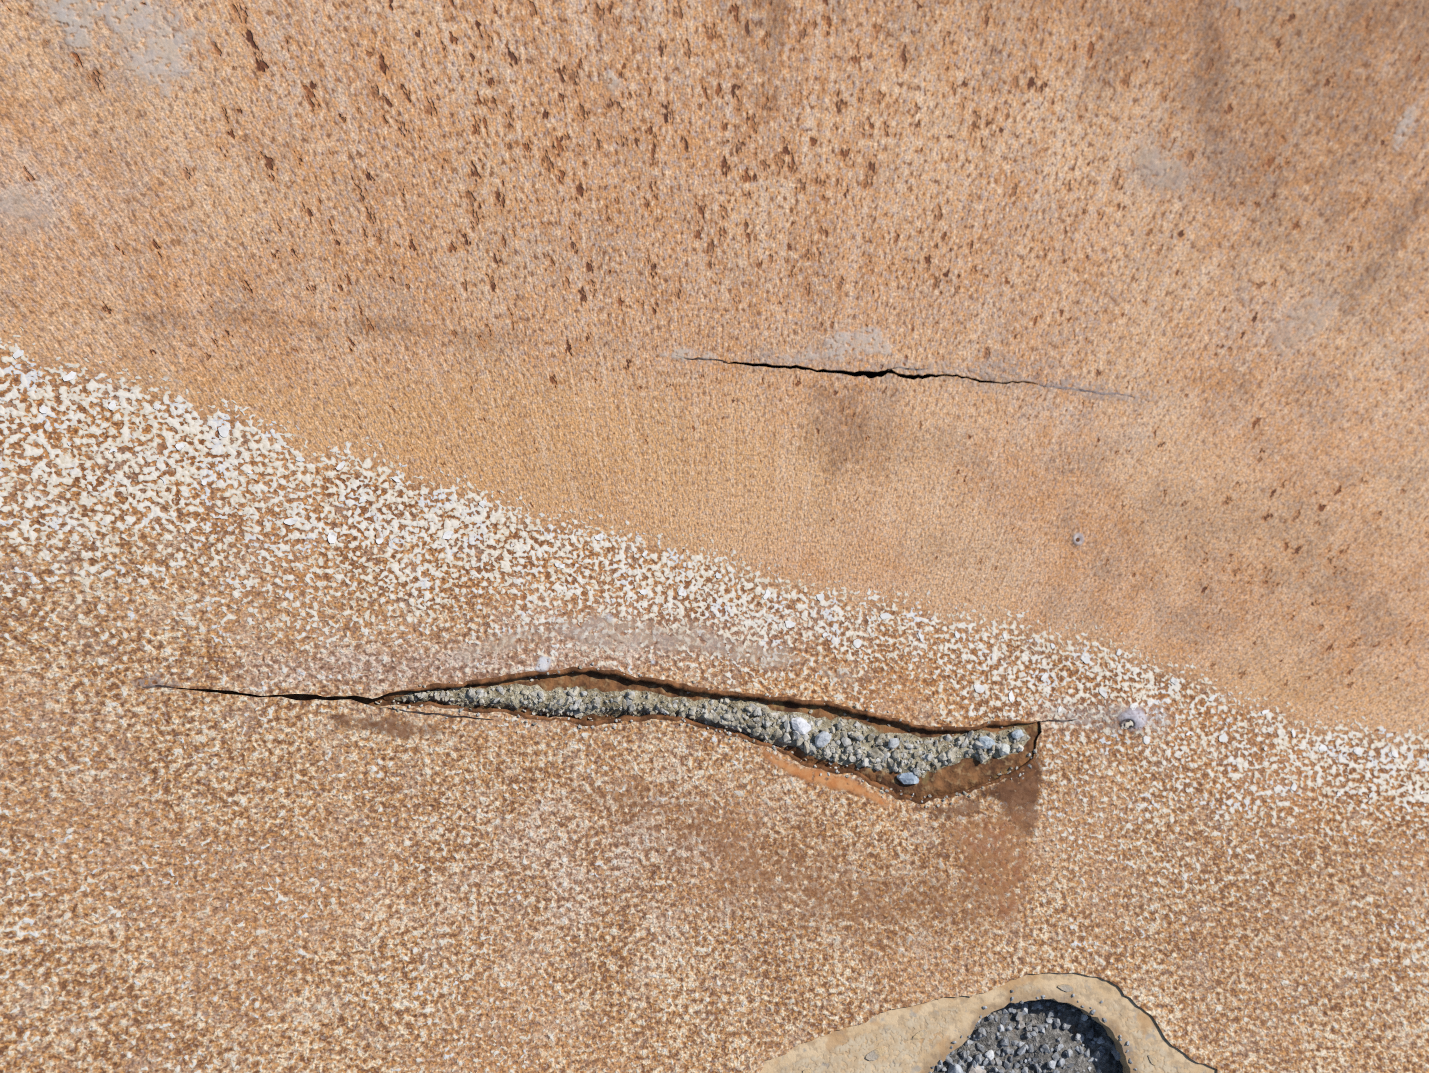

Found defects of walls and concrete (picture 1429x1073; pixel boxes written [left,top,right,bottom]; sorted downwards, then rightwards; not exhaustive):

peeling [0,327,1429,1073]
crack [677,355,1133,397]